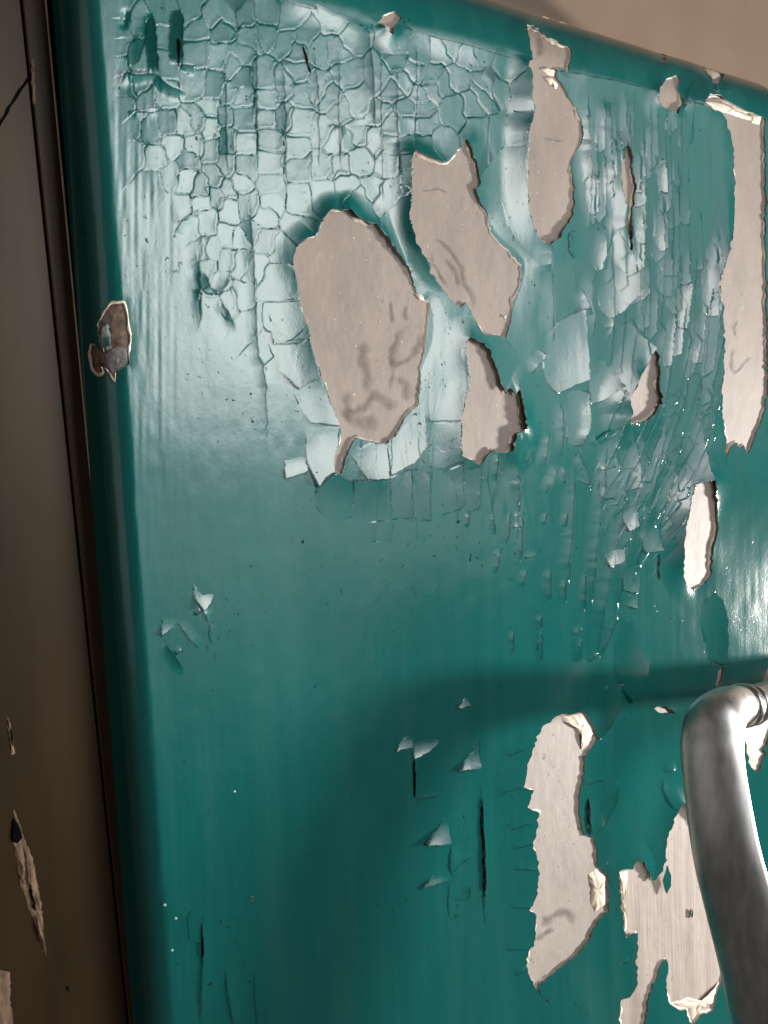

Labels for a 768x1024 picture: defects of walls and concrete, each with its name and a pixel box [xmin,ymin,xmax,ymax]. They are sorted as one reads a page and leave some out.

peeling [88,300,131,382]
crack [113,0,523,457]
peeling [269,132,534,523]
crack [347,69,722,671]
peeling [519,17,591,252]
peeling [541,134,670,499]
peeling [622,49,768,690]
peeling [11,810,46,954]
peeling [192,582,214,611]
crack [409,729,490,931]
peeling [517,703,725,1024]
peeling [744,720,768,781]